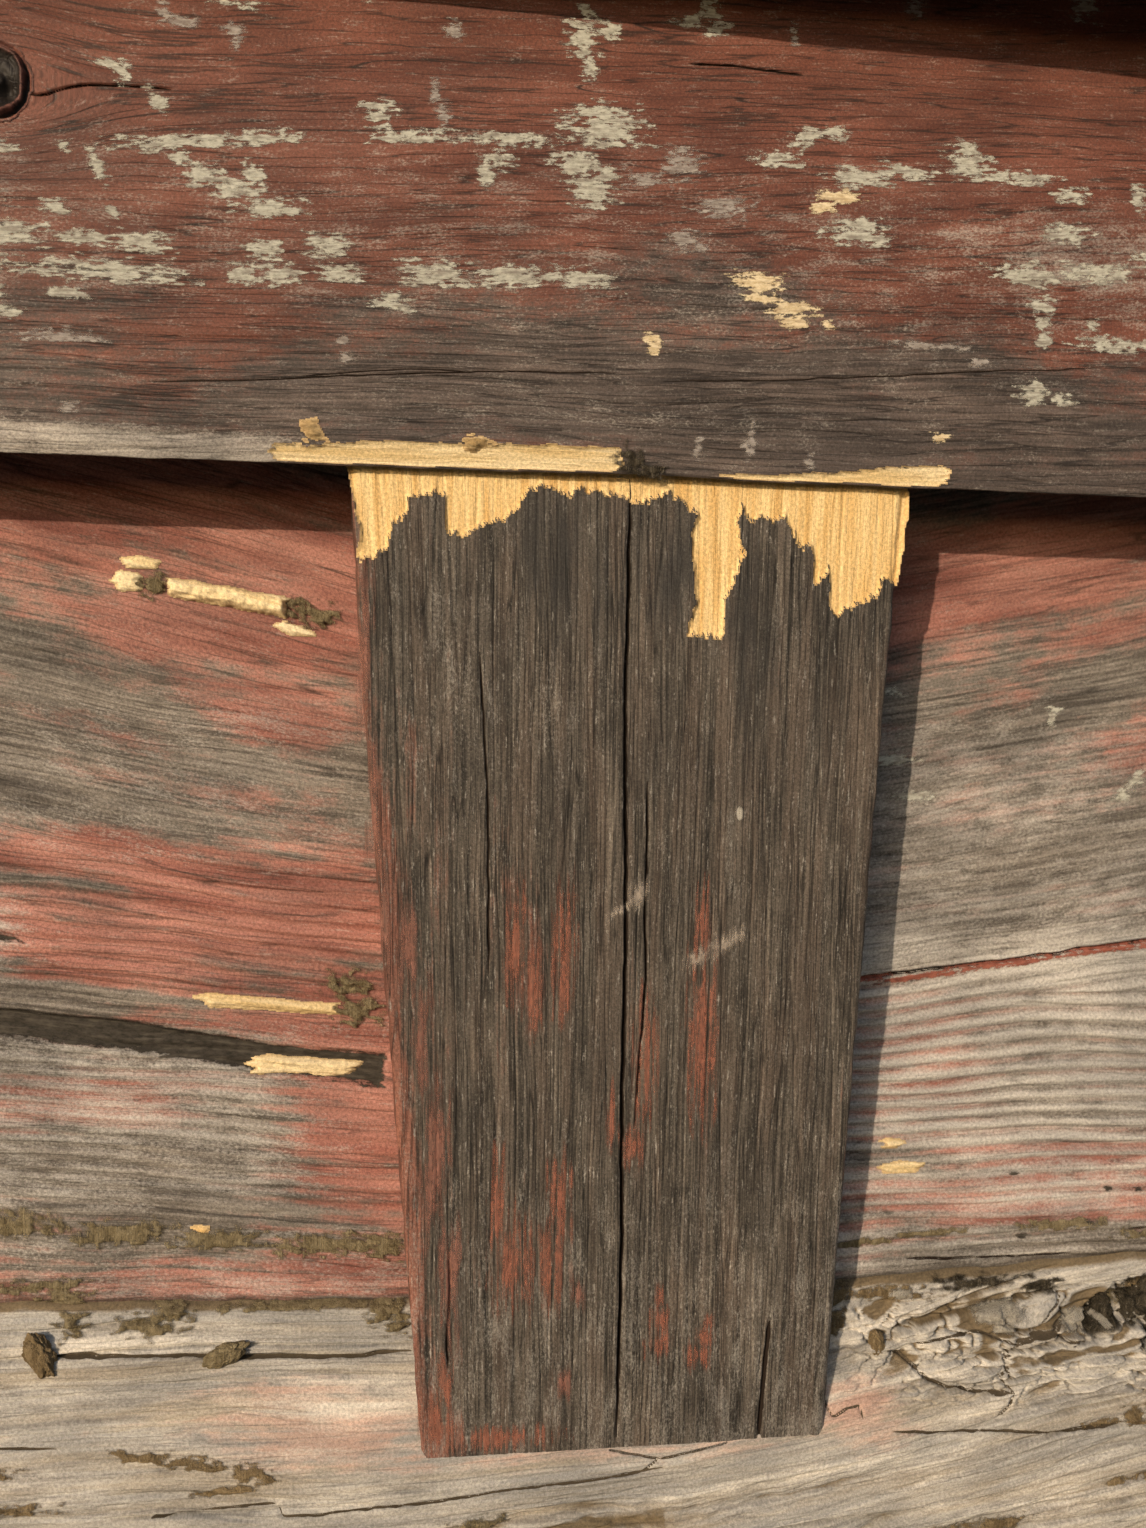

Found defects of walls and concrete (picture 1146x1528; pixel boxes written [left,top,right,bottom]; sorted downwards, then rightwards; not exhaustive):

peeling [88,56,172,116]
peeling [356,3,707,210]
peeling [746,126,1093,248]
peeling [0,127,627,343]
spalling [724,268,835,330]
peeling [979,222,1146,354]
crack [148,369,615,382]
peeling [643,331,664,356]
peeling [1011,377,1080,407]
spalling [267,421,952,640]
crack [861,939,1146,978]
spalling [1081,1275,1146,1354]